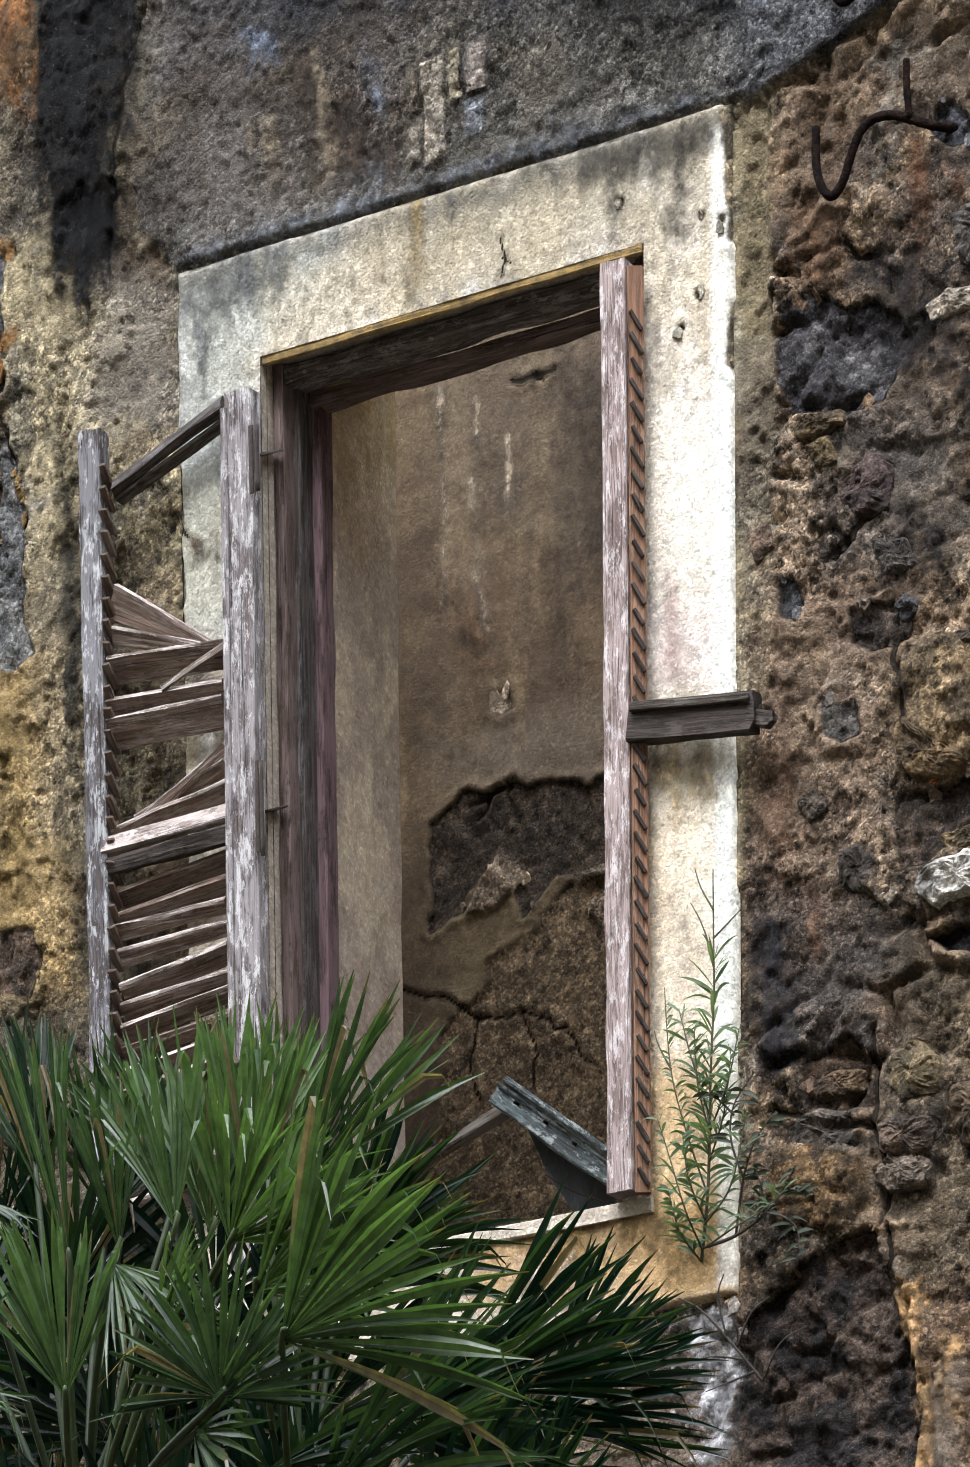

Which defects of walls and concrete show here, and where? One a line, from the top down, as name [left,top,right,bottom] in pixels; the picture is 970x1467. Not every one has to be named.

corrosion [0,0,36,104]
leakage [29,0,138,325]
spalling [776,287,912,415]
flaking render [0,438,35,672]
spalling [849,593,914,651]
spalling [821,691,860,743]
spalling [893,764,970,881]
spalling [931,927,970,951]
crack [403,988,592,1101]
flaking render [429,777,607,1236]
spalling [798,1036,880,1112]
spalling [659,1222,919,1467]